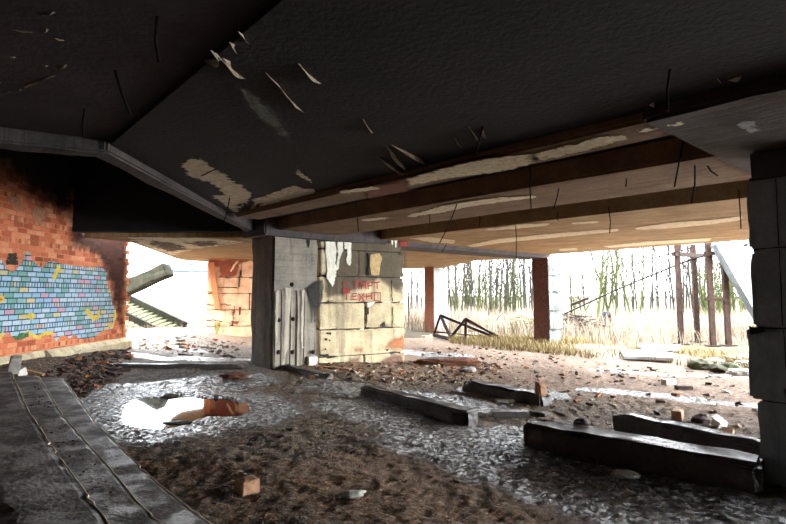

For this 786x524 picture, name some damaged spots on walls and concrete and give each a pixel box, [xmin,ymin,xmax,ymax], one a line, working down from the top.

peeling [181,159,315,223]
peeling [339,186,380,232]
peeling [378,135,628,212]